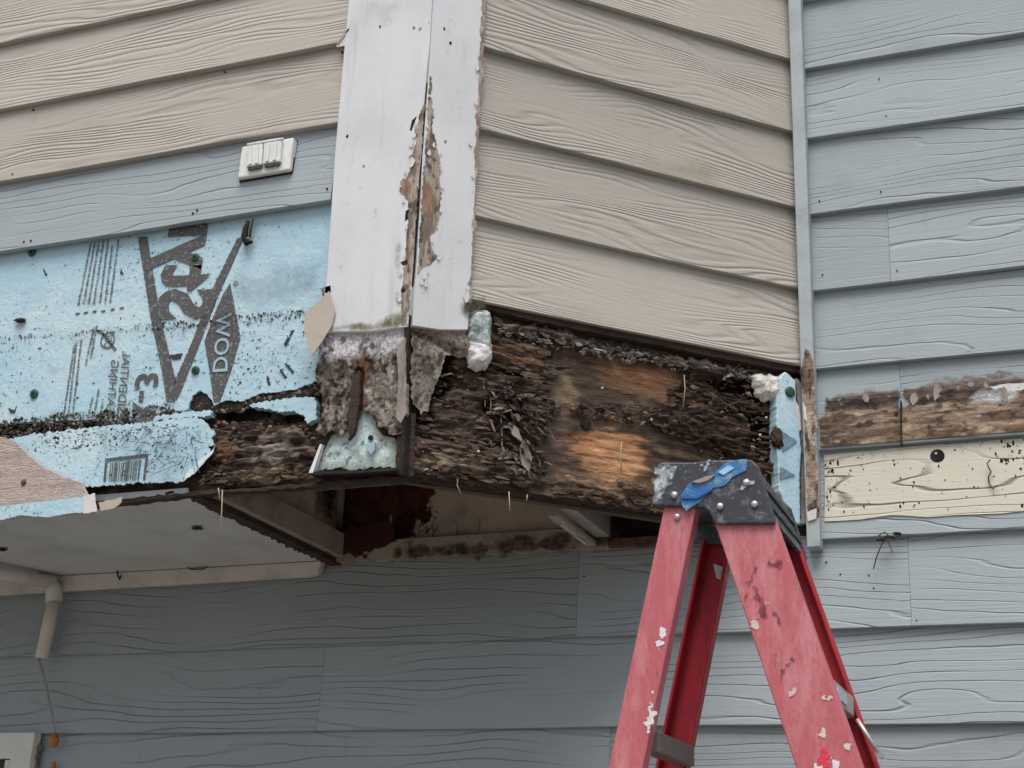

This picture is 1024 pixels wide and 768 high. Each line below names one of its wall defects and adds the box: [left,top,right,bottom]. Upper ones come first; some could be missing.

peeling [398,76,444,326]
peeling [910,382,942,406]
peeling [956,381,1024,402]
peeling [508,423,532,472]
peeling [83,493,123,514]
water stain [396,533,571,560]
water stain [585,530,620,545]